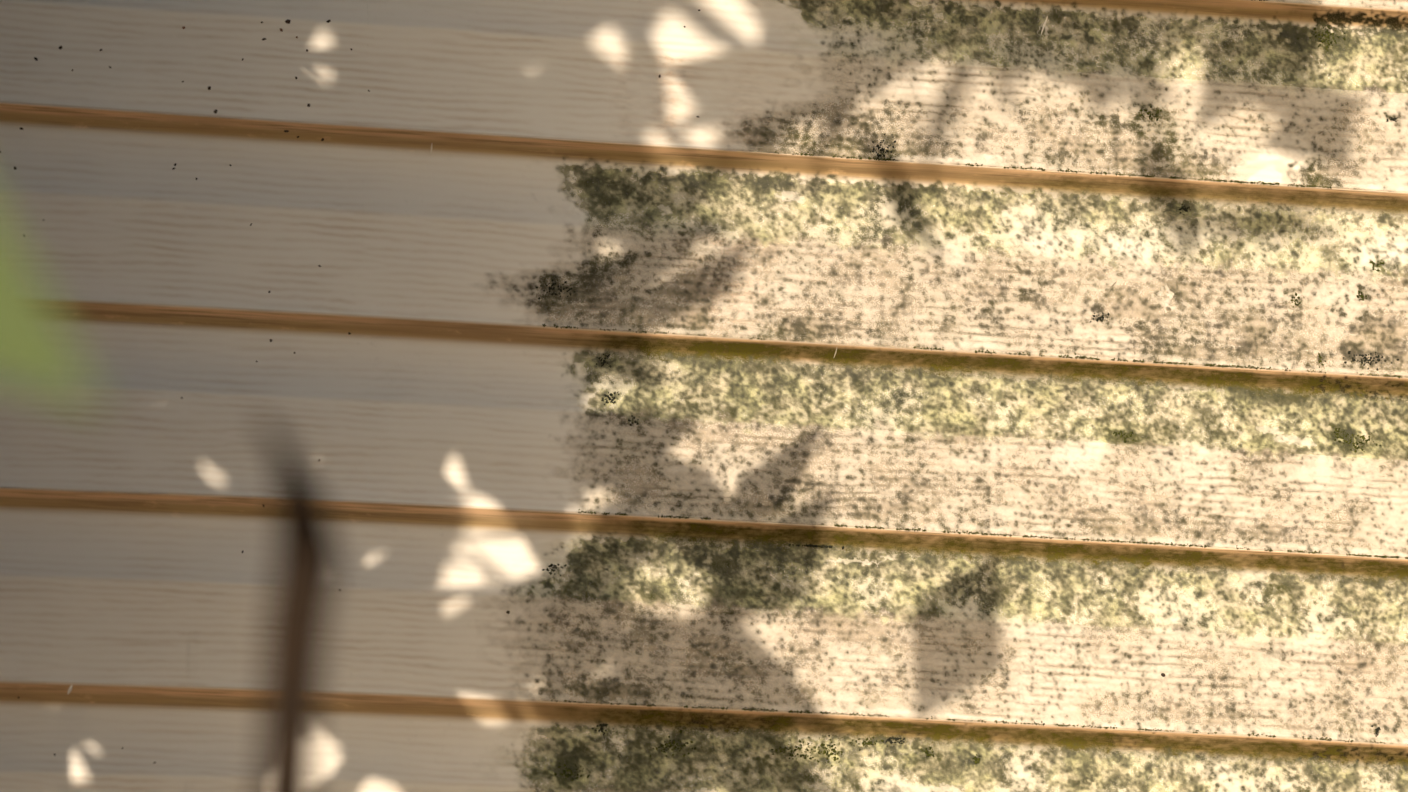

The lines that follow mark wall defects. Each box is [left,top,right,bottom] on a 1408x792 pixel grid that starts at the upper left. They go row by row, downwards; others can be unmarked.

damp [493,0,1408,792]